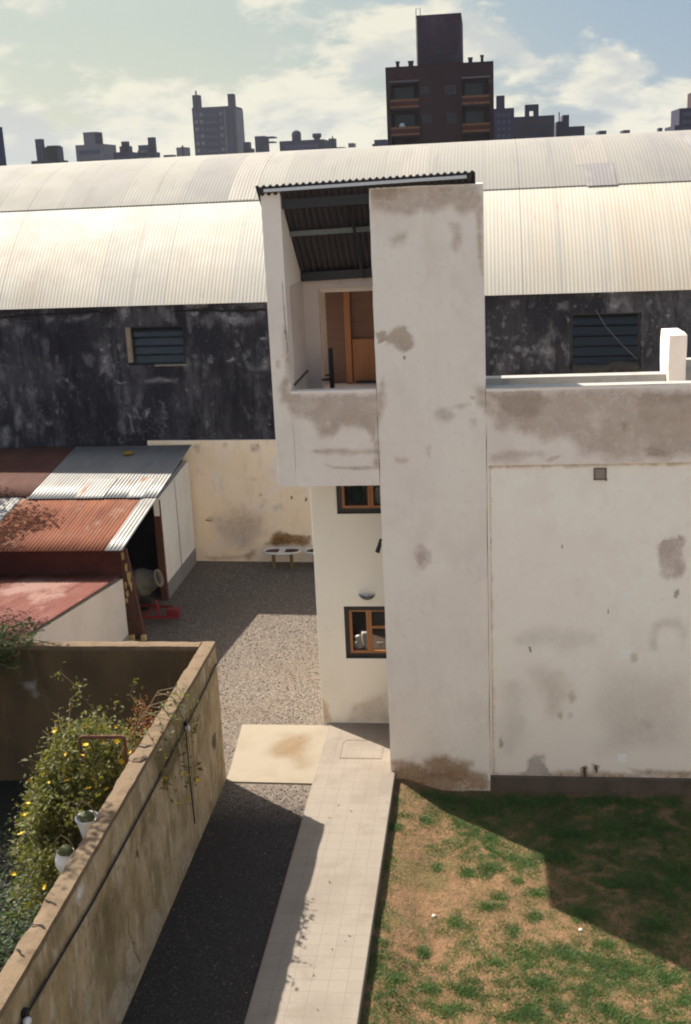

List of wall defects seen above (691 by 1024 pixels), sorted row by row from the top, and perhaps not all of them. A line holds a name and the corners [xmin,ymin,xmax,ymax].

water stain [1,408,32,447]
water stain [393,757,487,791]